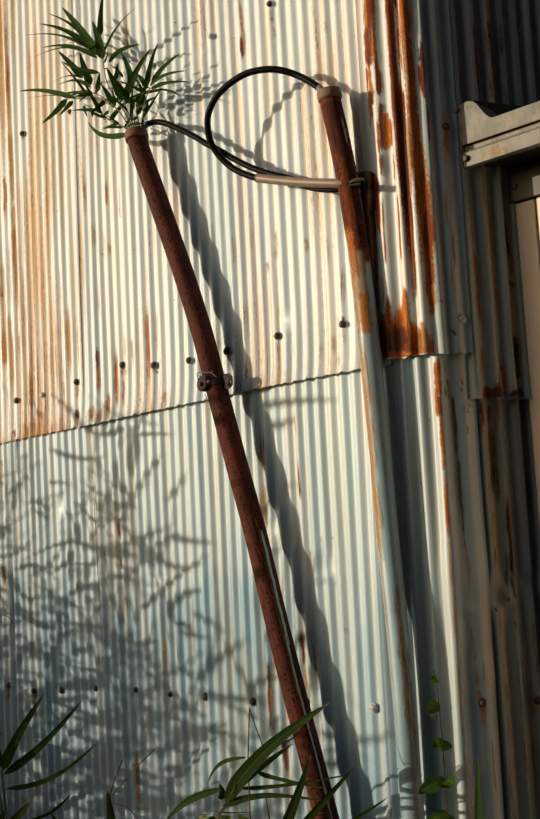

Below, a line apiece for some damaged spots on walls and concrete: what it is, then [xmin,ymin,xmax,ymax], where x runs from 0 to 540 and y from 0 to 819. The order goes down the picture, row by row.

corrosion [0,0,23,383]
corrosion [66,317,78,371]
corrosion [145,310,158,378]
corrosion [75,359,126,420]
corrosion [480,334,524,433]
corrosion [299,632,316,684]